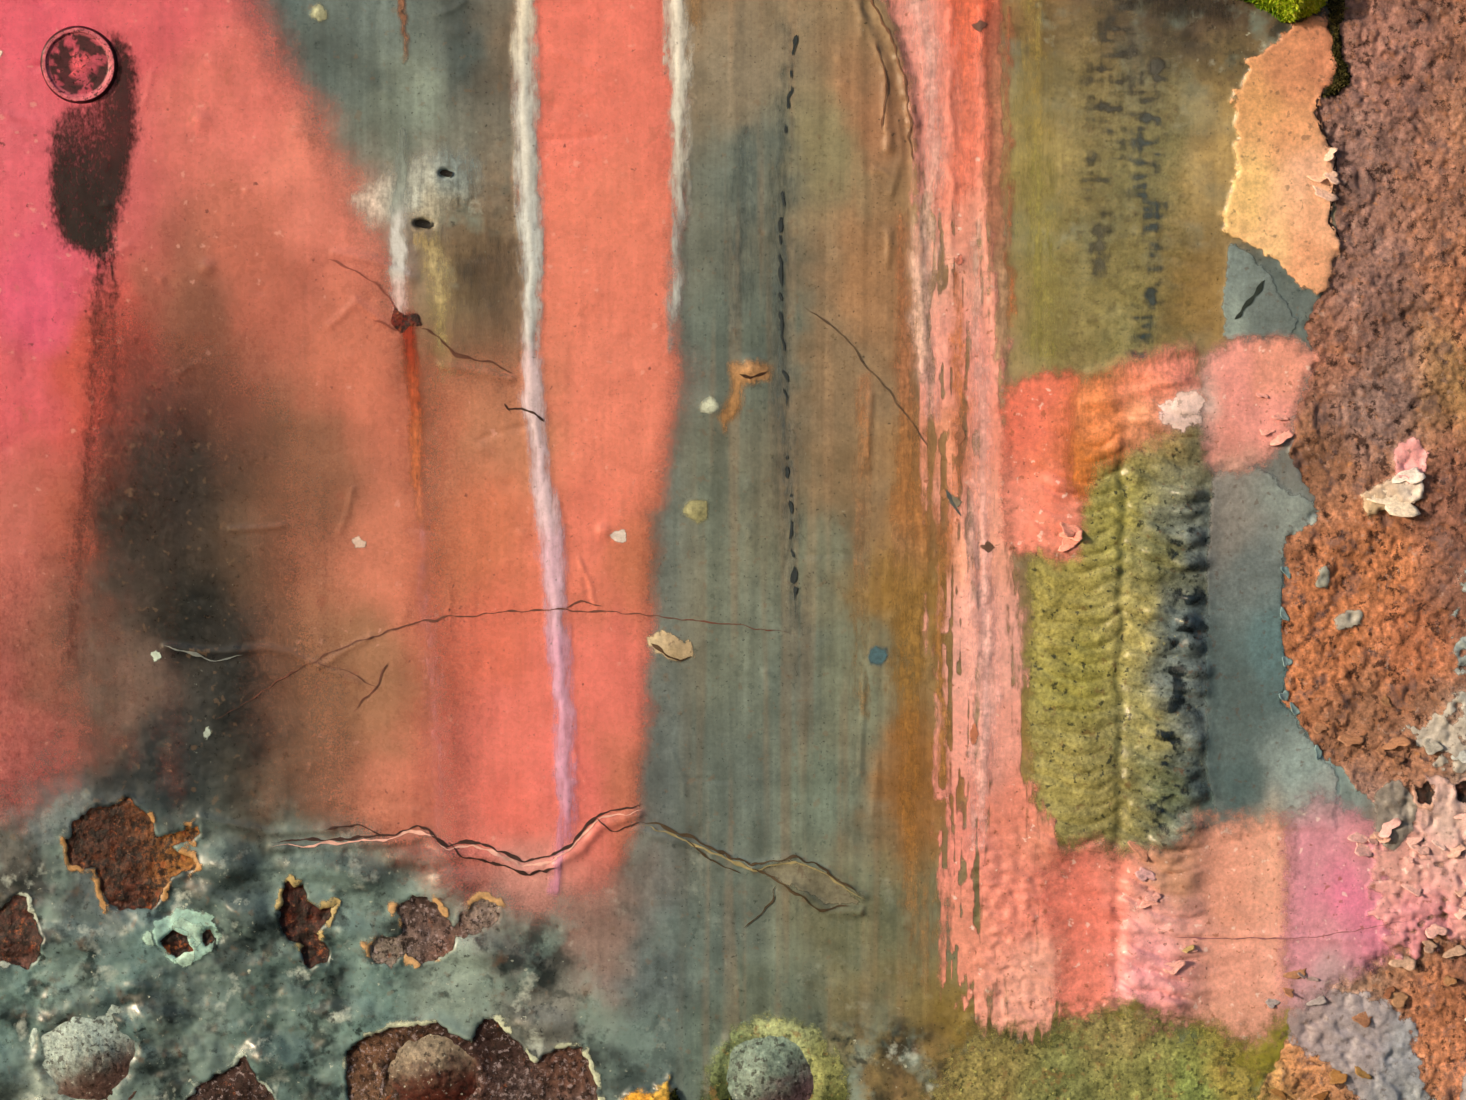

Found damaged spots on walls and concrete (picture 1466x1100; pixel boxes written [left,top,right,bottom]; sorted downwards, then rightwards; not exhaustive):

rust [391,307,423,520]
crack [219,0,932,718]
peeling [1360,437,1430,518]
crack [167,646,240,662]
peeling [1334,610,1363,630]
peeling [1368,637,1466,960]
peeling [152,907,217,964]
peeling [1265,968,1436,1100]